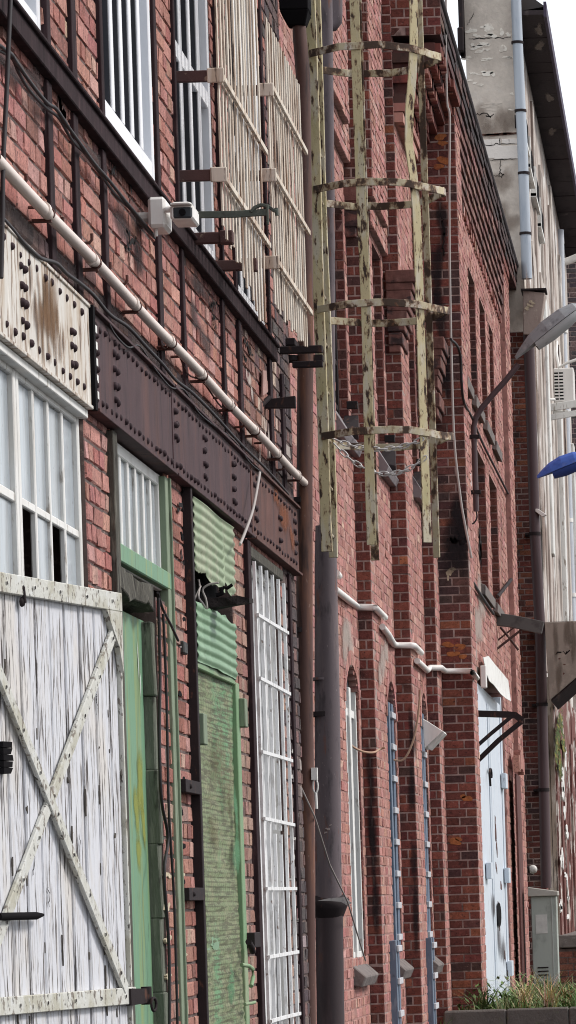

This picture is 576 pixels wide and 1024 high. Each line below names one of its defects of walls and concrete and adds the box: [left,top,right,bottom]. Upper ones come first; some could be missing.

peeling [461,23,513,86]
corrosion [31,267,65,372]